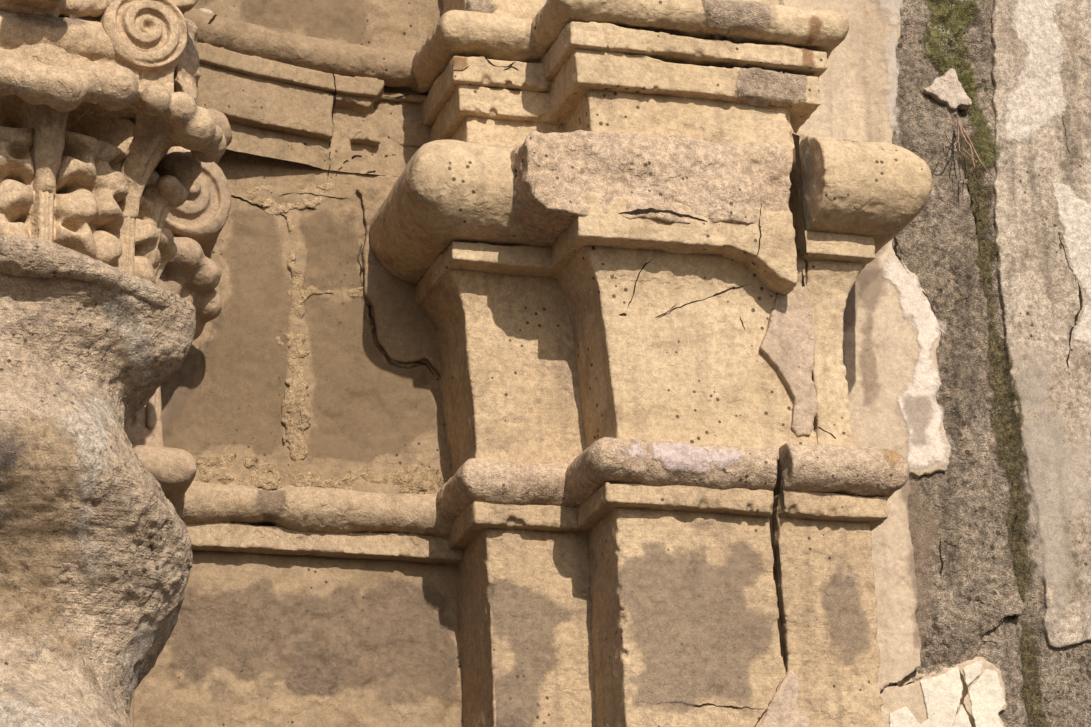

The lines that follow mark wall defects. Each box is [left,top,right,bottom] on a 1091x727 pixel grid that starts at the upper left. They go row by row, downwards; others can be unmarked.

crack [231,70,441,378]
crack [618,208,706,221]
crack [755,204,763,256]
crack [619,259,653,316]
crack [655,284,749,318]
crack [1059,236,1085,369]
flaking render [883,258,951,471]
crack [640,489,796,727]
peeling [880,657,1007,727]